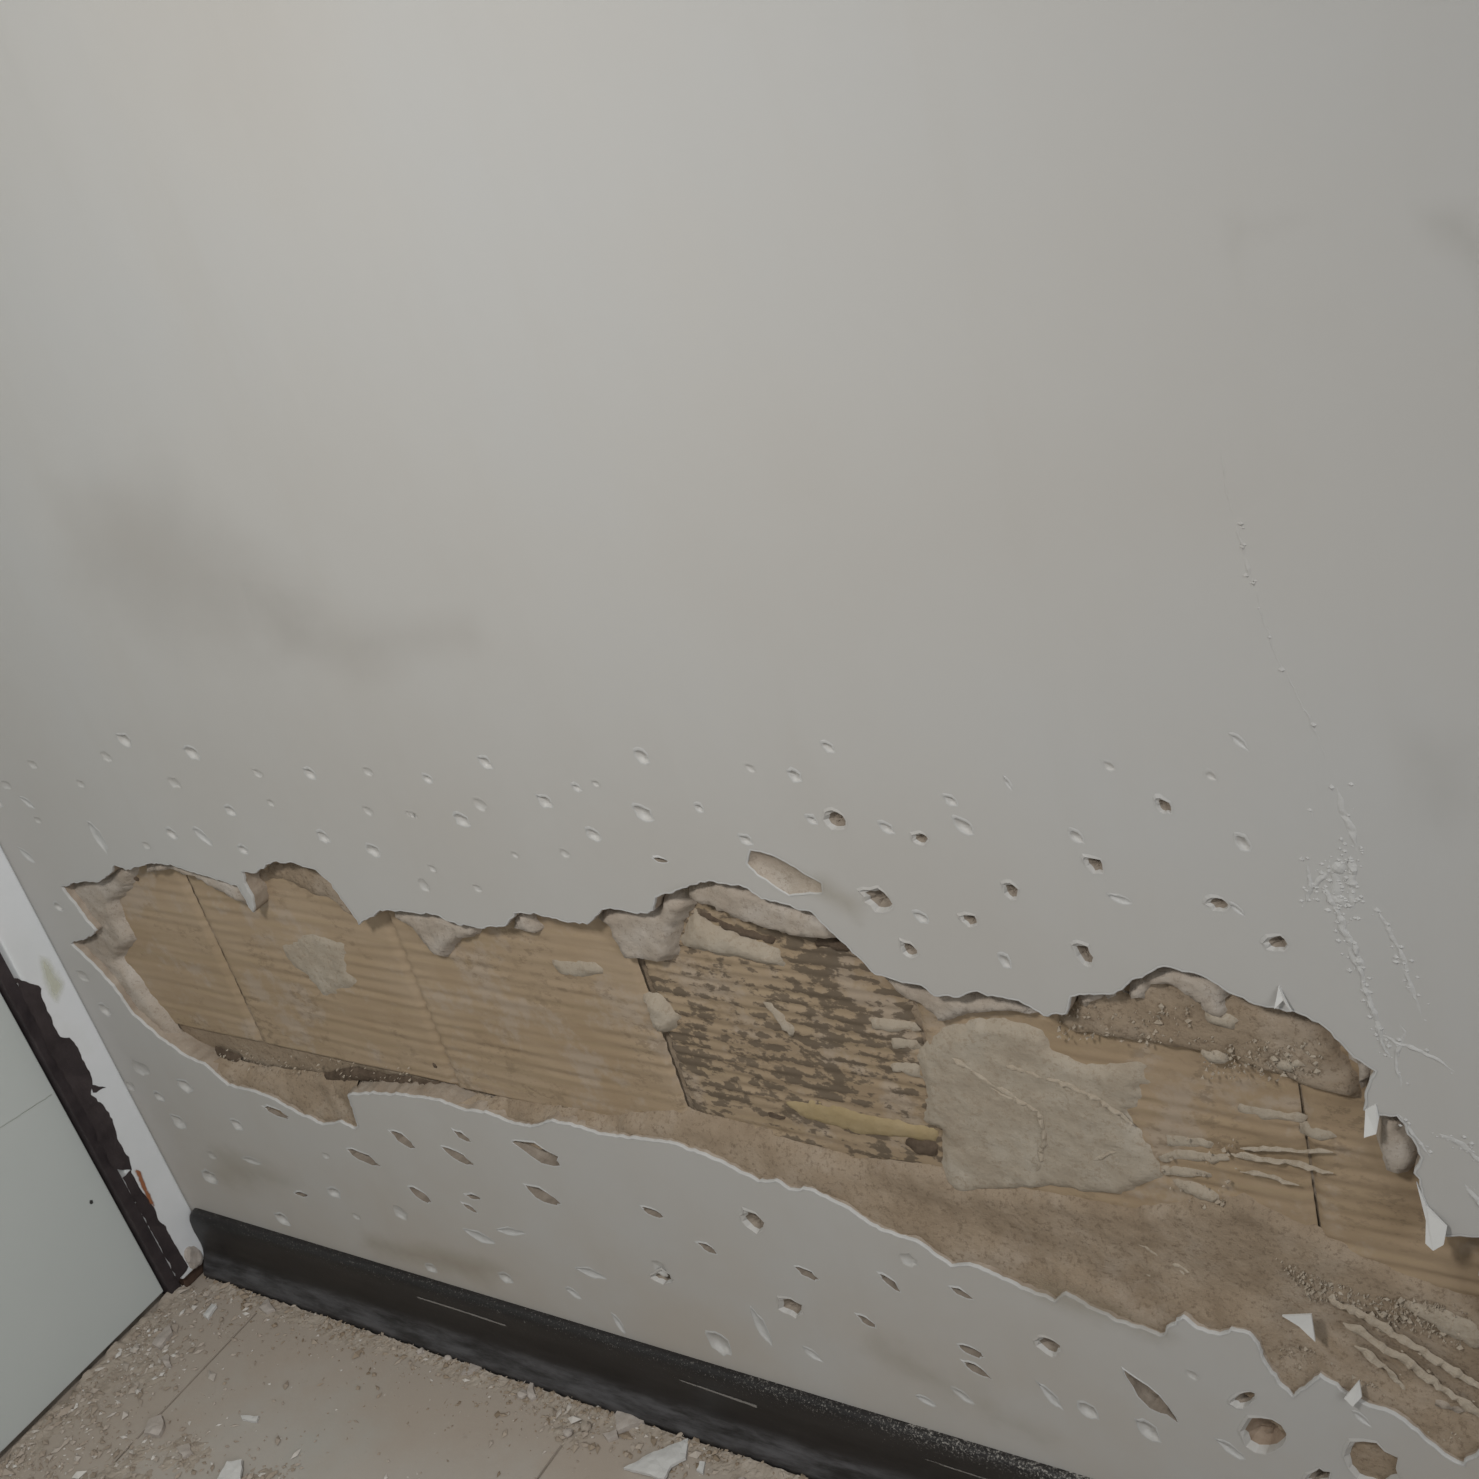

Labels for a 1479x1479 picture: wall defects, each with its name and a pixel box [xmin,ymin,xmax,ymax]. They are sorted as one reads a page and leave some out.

peeling [14,978,188,1282]
spalling [60,849,1479,1467]
spalling [1302,1438,1401,1479]